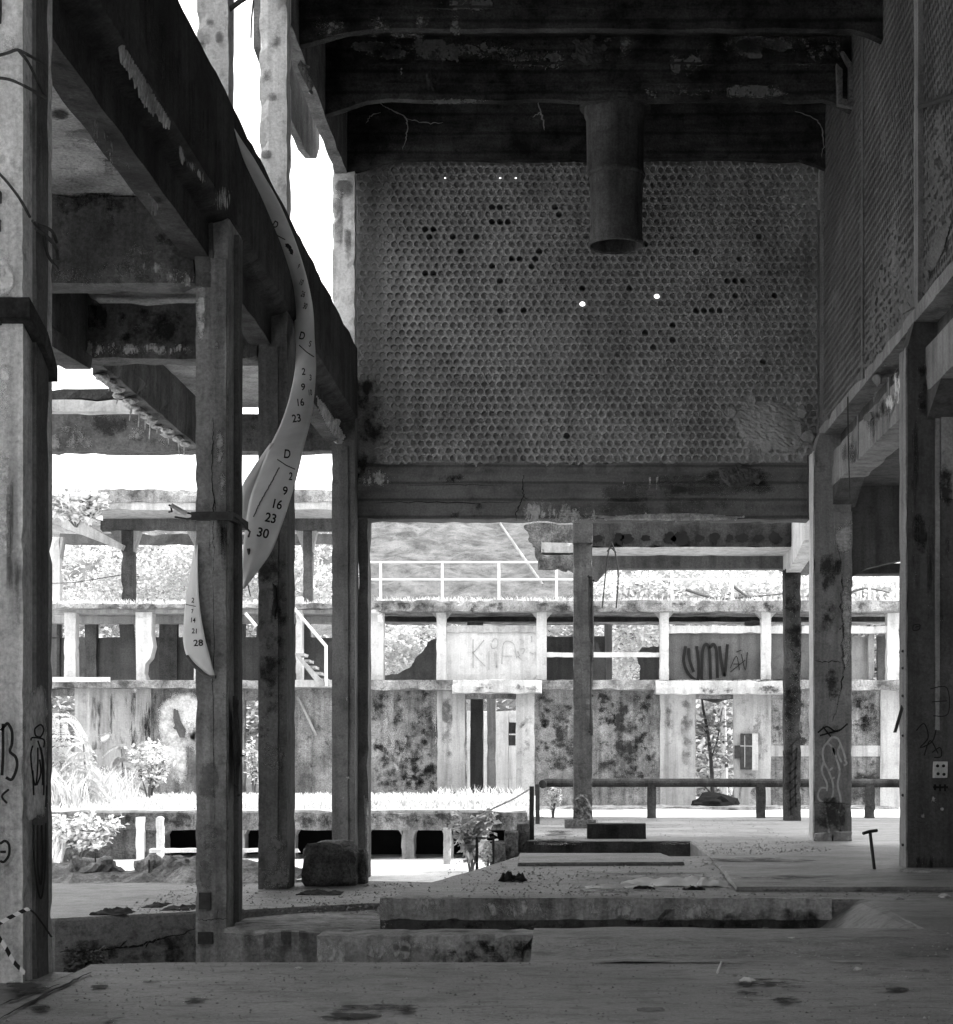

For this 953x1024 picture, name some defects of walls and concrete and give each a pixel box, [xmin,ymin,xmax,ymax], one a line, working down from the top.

crack [366,104,443,149]
crack [795,111,825,156]
peeling [52,426,91,448]
spalling [95,373,191,456]
crack [384,475,526,517]
damp [820,555,841,590]
crack [816,545,845,719]
damp [373,692,452,793]
damp [517,685,573,769]
damp [598,693,656,778]
damp [818,798,845,832]
crack [0,911,226,1019]